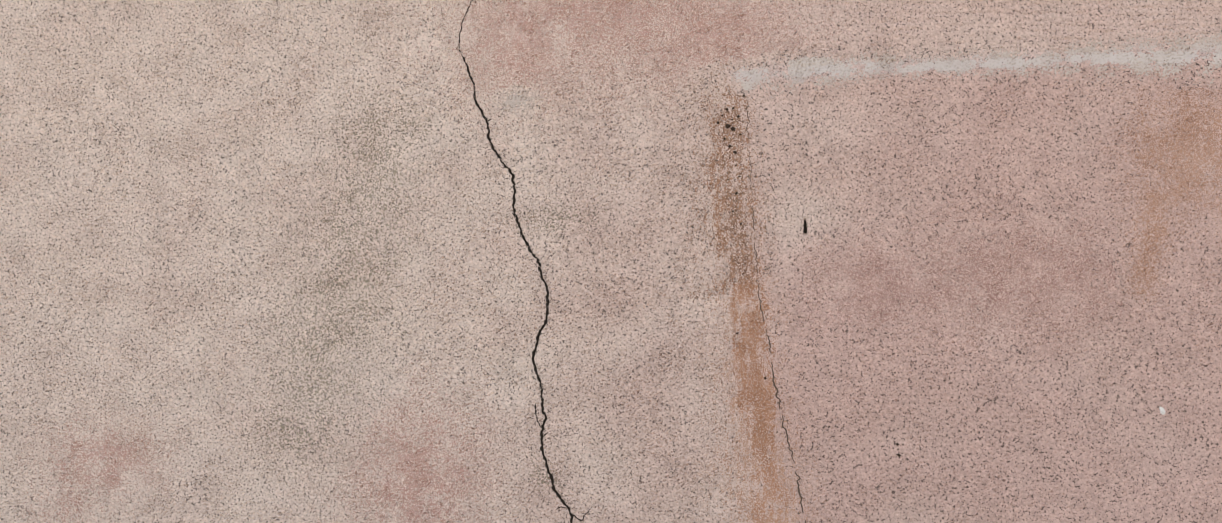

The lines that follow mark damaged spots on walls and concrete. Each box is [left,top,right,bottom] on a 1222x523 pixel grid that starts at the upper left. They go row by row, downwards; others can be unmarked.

crack [459,0,590,523]